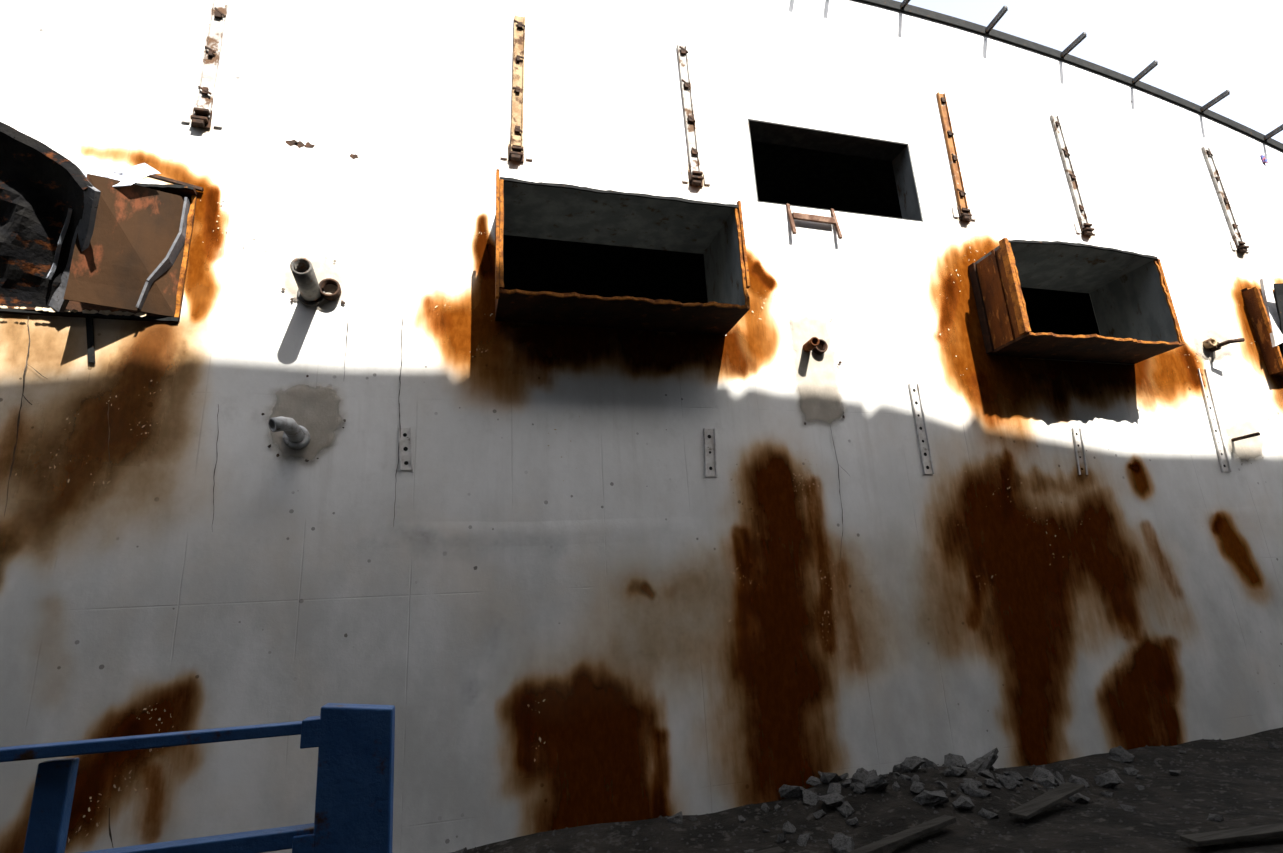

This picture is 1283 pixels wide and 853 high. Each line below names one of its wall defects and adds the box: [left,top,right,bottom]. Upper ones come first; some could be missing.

corrosion [133,153,233,319]
corrosion [433,215,776,381]
corrosion [936,238,1201,416]
corrosion [1235,283,1283,399]
corrosion [0,316,191,565]
corrosion [729,449,837,804]
corrosion [941,454,1182,766]
corrosion [1214,516,1261,586]
corrosion [0,817,29,853]
corrosion [66,679,196,844]
corrosion [507,667,667,833]